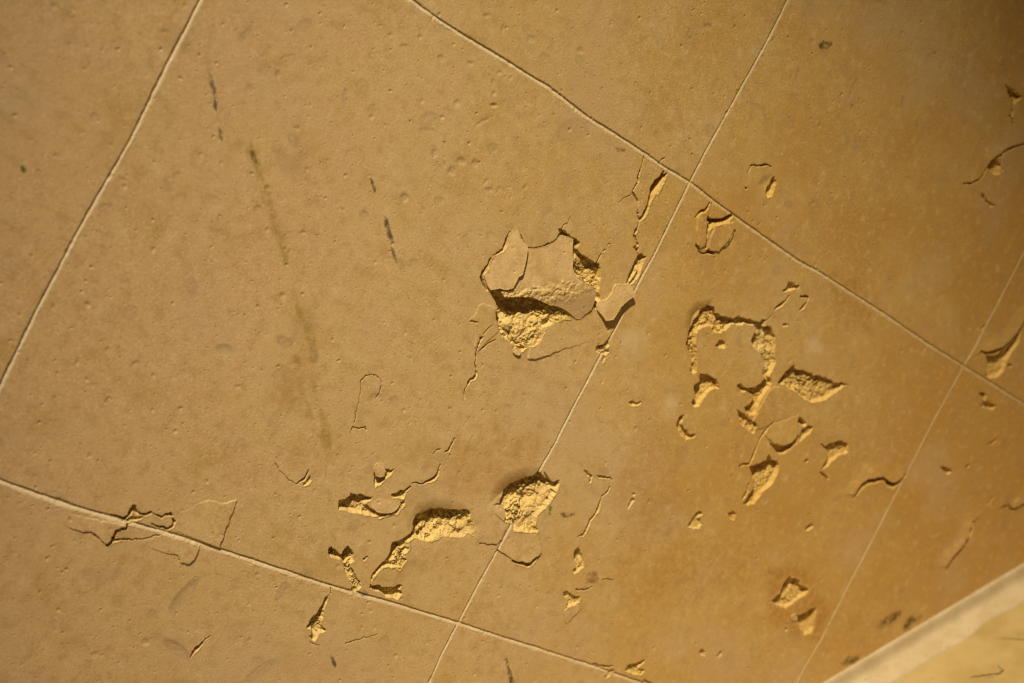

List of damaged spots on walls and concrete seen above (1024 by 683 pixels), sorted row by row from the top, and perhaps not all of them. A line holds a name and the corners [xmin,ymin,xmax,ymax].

spalling [743,161,779,202]
spalling [467,215,635,367]
spalling [675,278,850,442]
spalling [977,320,1024,412]
spalling [727,453,781,523]
spalling [803,439,850,482]
crack [852,475,908,501]
spalling [325,463,562,602]
spalling [687,510,705,532]
spalling [304,587,334,648]
spalling [768,574,818,638]